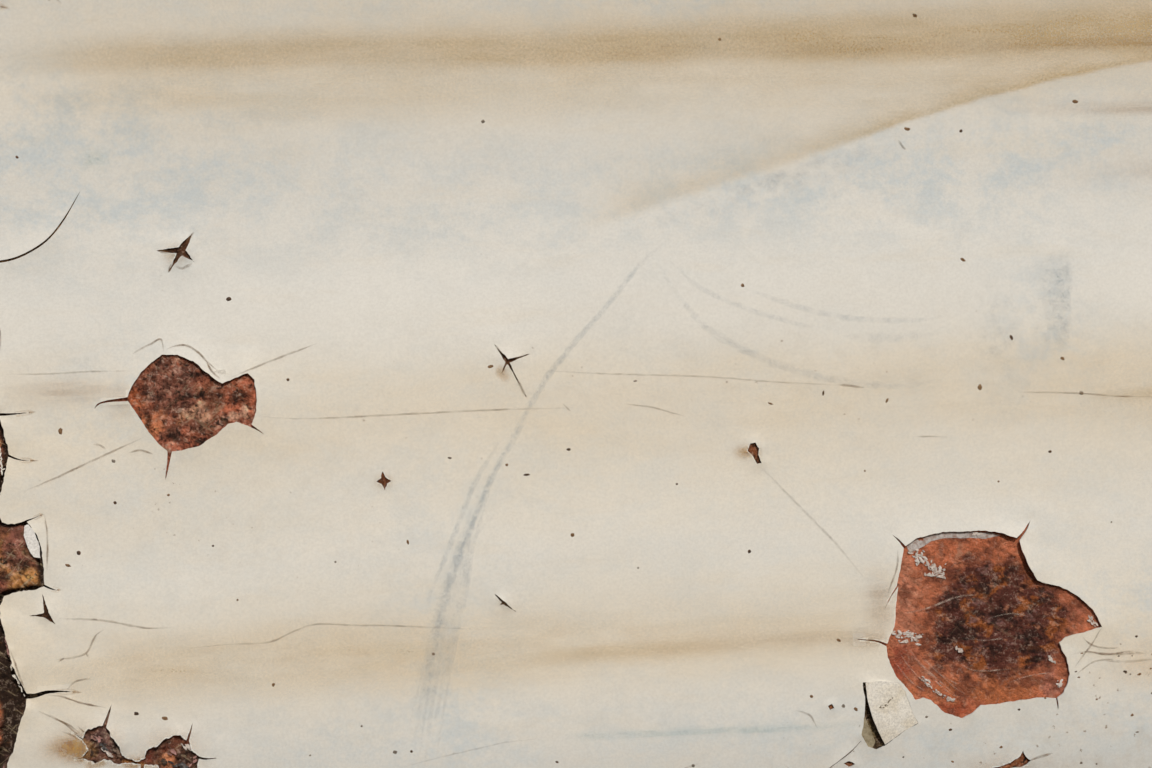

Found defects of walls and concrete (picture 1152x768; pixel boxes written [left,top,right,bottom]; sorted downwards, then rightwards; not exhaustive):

crack [135,211,215,293]
crack [472,323,552,418]
peeling [733,429,775,476]
peeling [0,279,294,768]
peeling [828,488,1130,768]
crack [1135,632,1152,675]